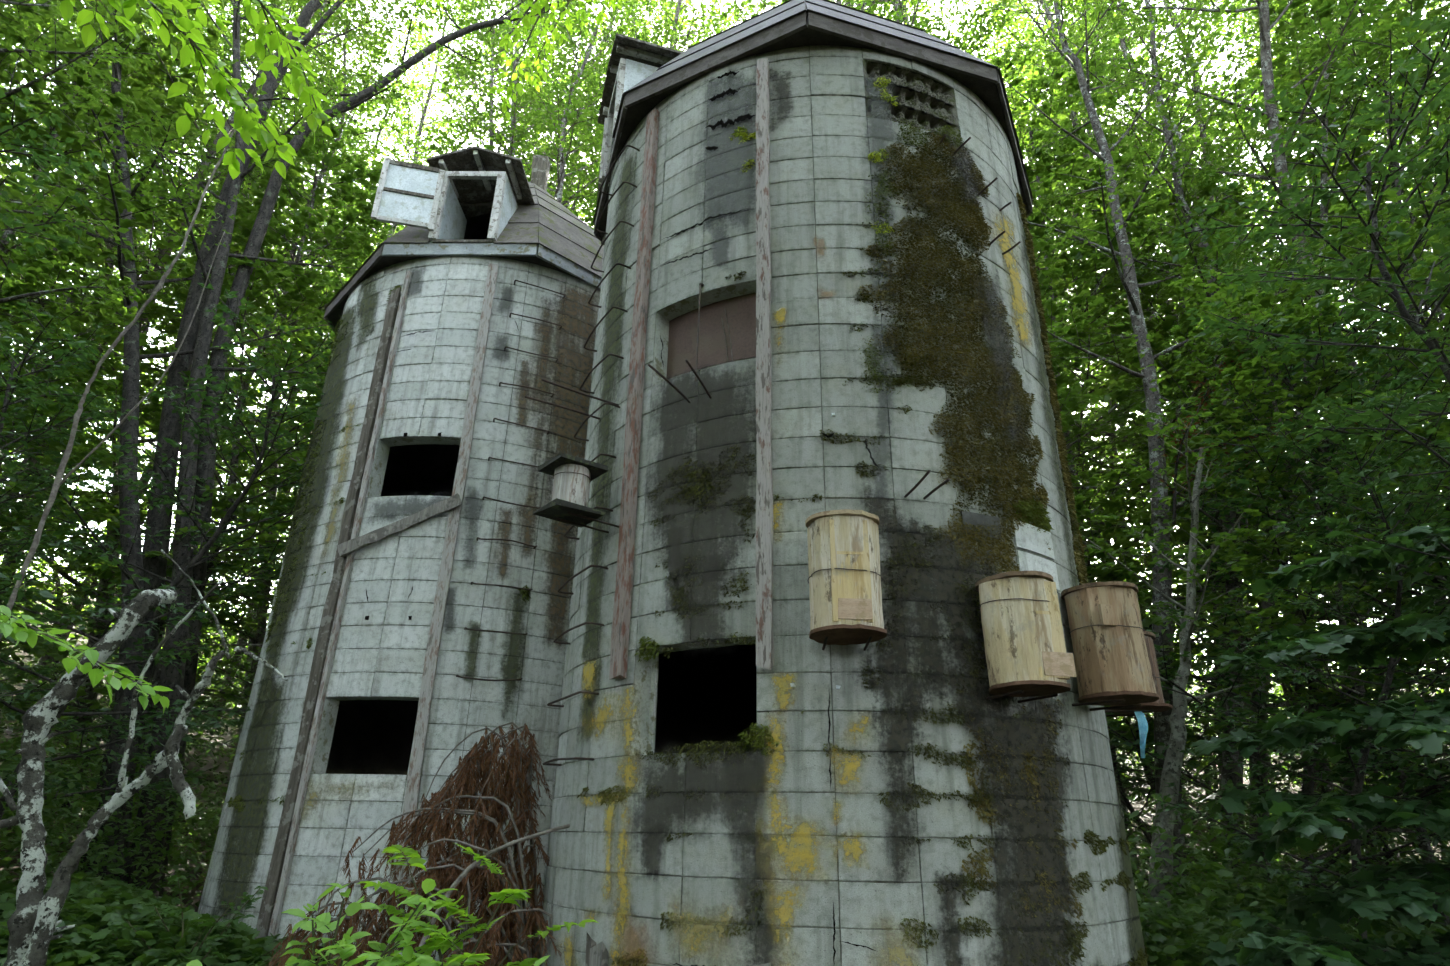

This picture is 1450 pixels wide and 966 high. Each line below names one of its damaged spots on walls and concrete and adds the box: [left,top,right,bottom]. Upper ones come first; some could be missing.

water stain [408,270,423,295]
water stain [698,69,793,266]
water stain [865,78,898,294]
water stain [373,496,446,521]
water stain [464,487,481,568]
water stain [492,153,636,738]
water stain [645,367,756,647]
water stain [445,588,482,681]
water stain [861,318,1098,966]
water stain [581,718,866,966]
water stain [1116,775,1148,966]